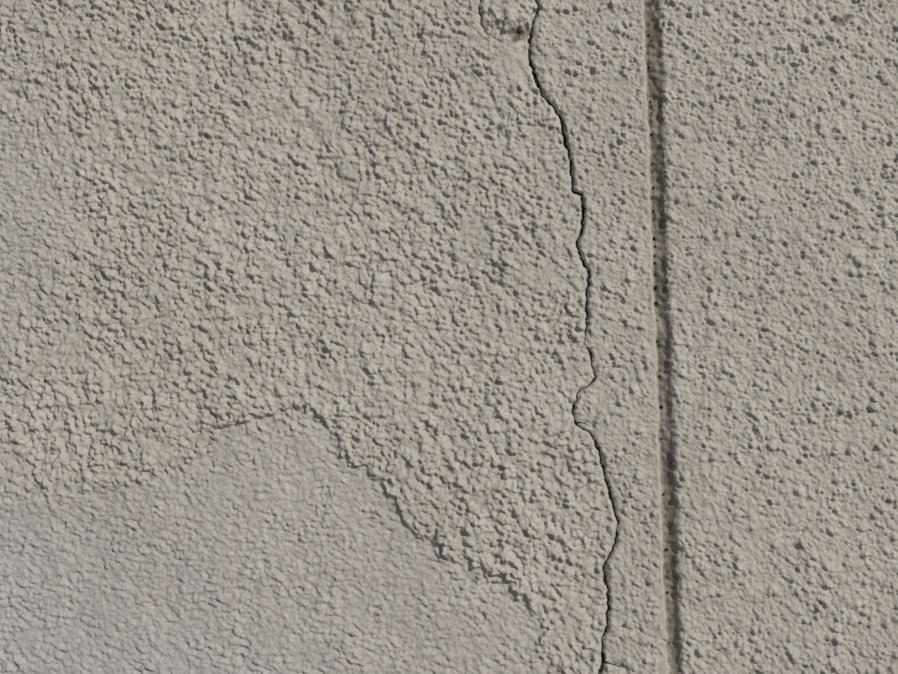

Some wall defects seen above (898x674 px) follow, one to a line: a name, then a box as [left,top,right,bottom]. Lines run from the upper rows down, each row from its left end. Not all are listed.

peeling [0,402,577,674]
crack [528,0,621,674]